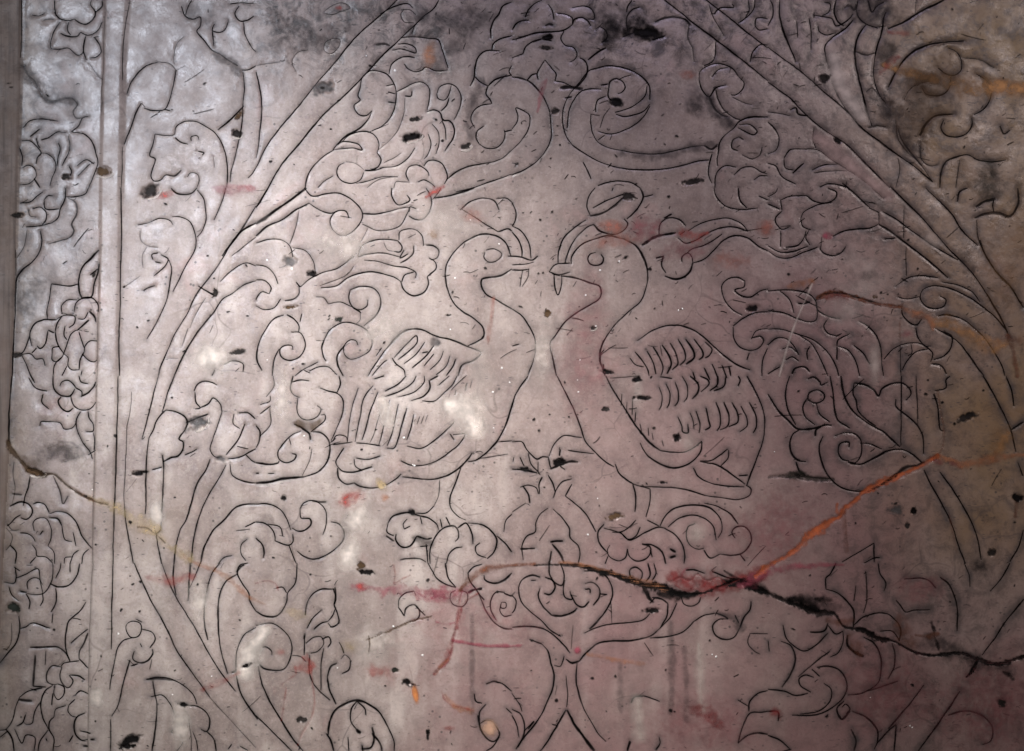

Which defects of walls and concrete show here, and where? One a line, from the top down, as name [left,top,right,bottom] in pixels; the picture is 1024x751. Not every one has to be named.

crack [6,440,107,505]
crack [459,454,1024,680]